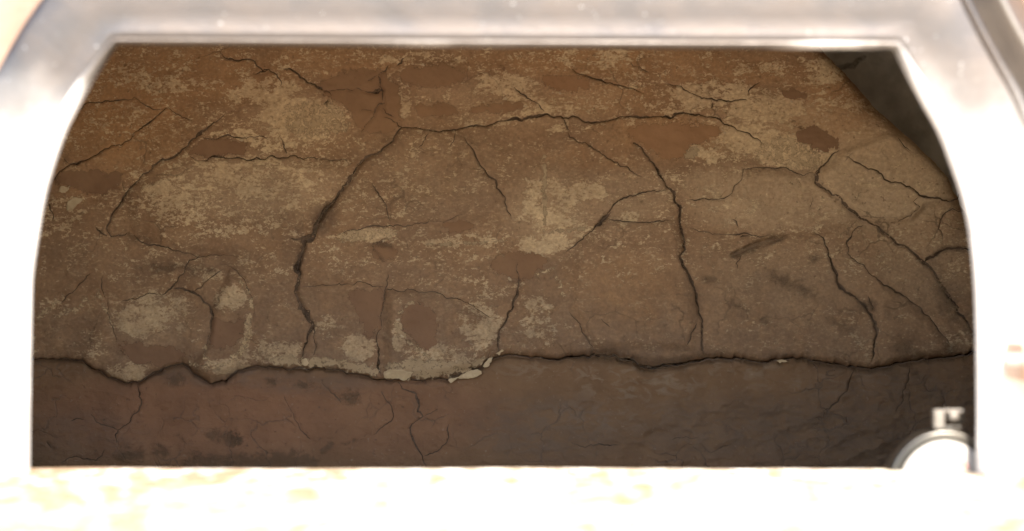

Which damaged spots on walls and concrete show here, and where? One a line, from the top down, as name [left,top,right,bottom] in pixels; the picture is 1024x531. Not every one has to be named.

peeling [448,349,504,383]
crack [33,54,976,466]